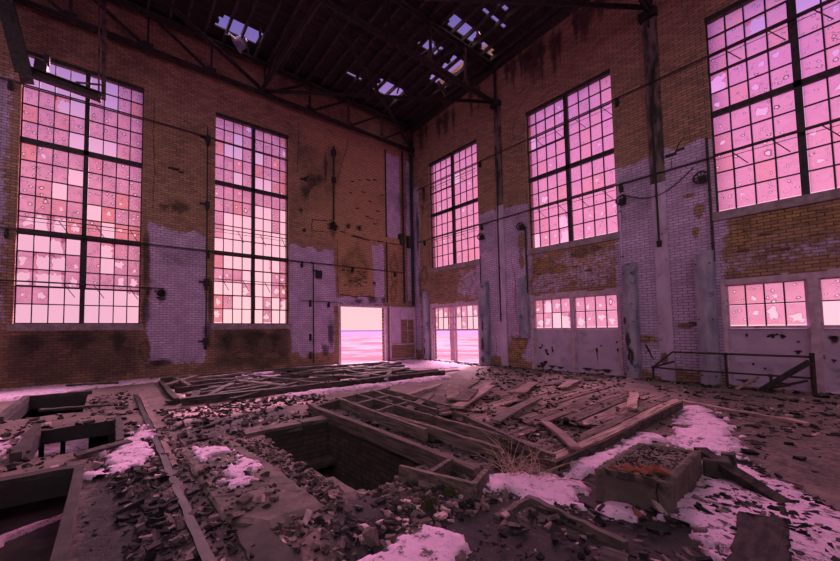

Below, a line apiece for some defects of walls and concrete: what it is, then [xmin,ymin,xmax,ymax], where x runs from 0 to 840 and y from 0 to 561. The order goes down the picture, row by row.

peeling [518,233,601,284]
peeling [139,340,168,369]
peeling [508,336,527,362]